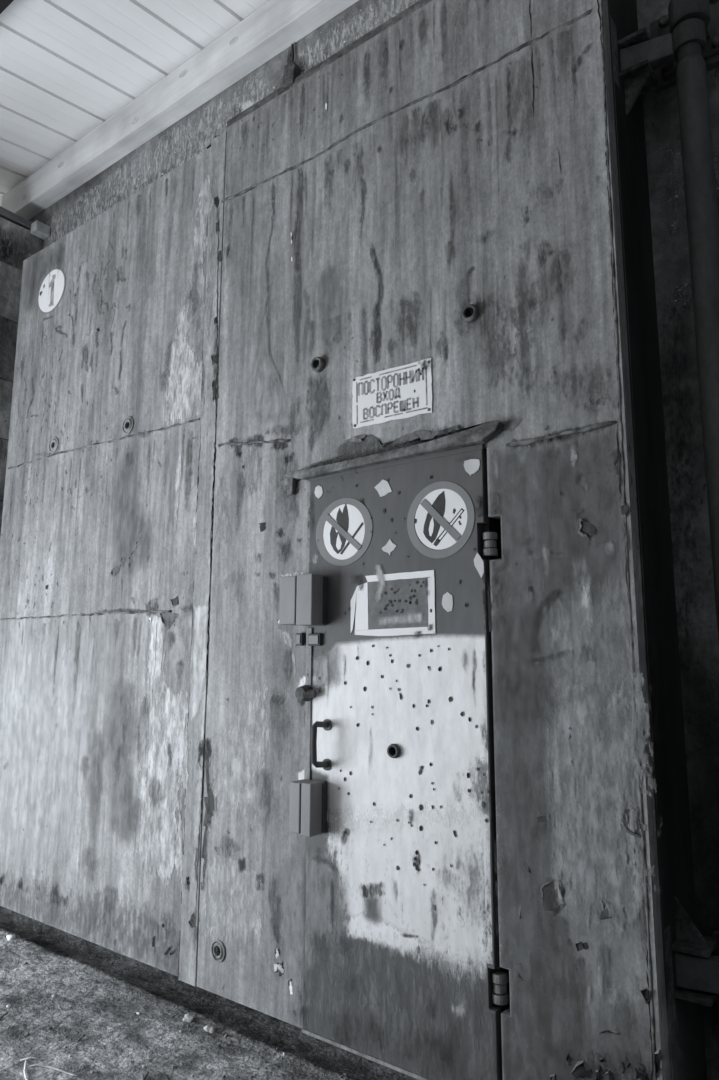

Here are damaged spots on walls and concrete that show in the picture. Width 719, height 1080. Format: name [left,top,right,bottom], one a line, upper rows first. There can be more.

corrosion [370,249,418,361]
corrosion [457,244,569,392]
water stain [83,684,136,838]
corrosion [186,739,216,888]
peeling [536,569,653,962]
corrosion [188,913,199,946]
peeling [587,966,653,1004]
peeling [550,1049,660,1080]